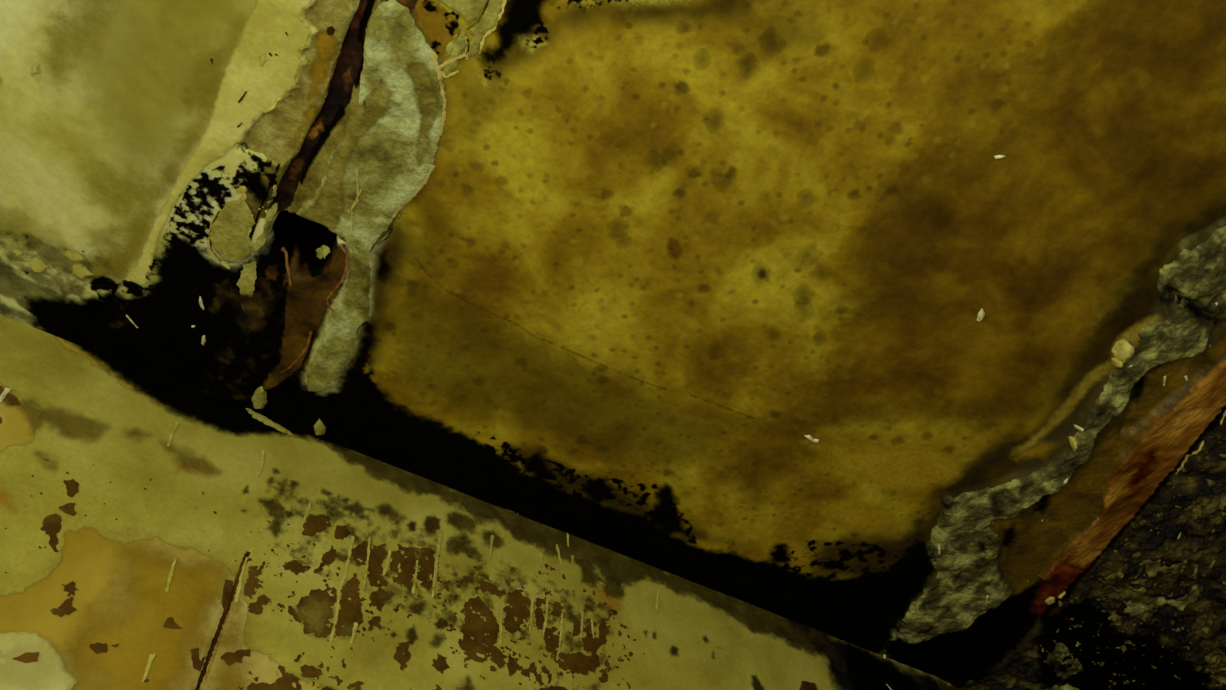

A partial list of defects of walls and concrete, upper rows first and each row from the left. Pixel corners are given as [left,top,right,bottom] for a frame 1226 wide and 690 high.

leakage [713,0,734,11]
spalling [122,0,507,392]
leakage [811,0,1226,423]
leakage [704,355,729,380]
leakage [757,422,818,457]
peeling [0,313,840,690]
leakage [408,516,440,532]
leakage [745,469,763,497]
leakage [834,499,894,535]
leakage [834,447,959,491]
leakage [990,318,1226,675]
corrosion [1031,361,1226,614]